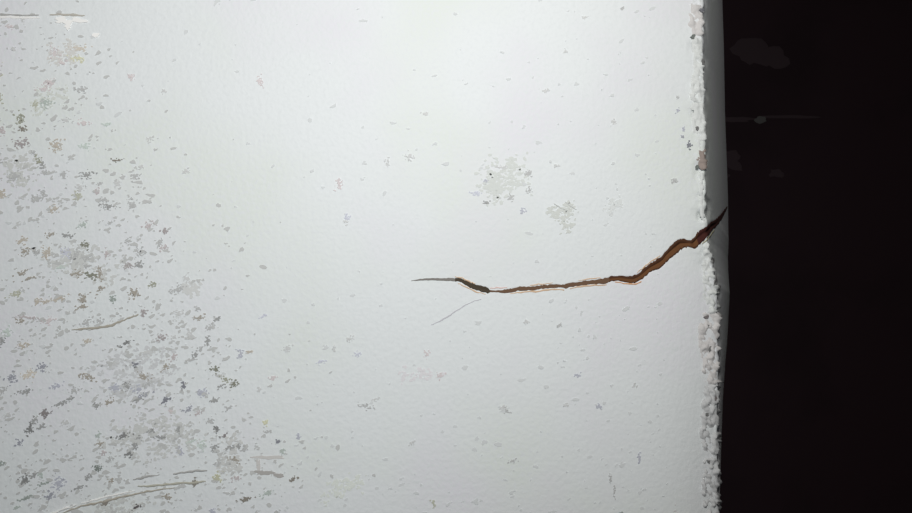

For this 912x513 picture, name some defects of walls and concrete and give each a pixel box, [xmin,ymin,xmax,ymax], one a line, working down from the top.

crack [411,207,727,325]